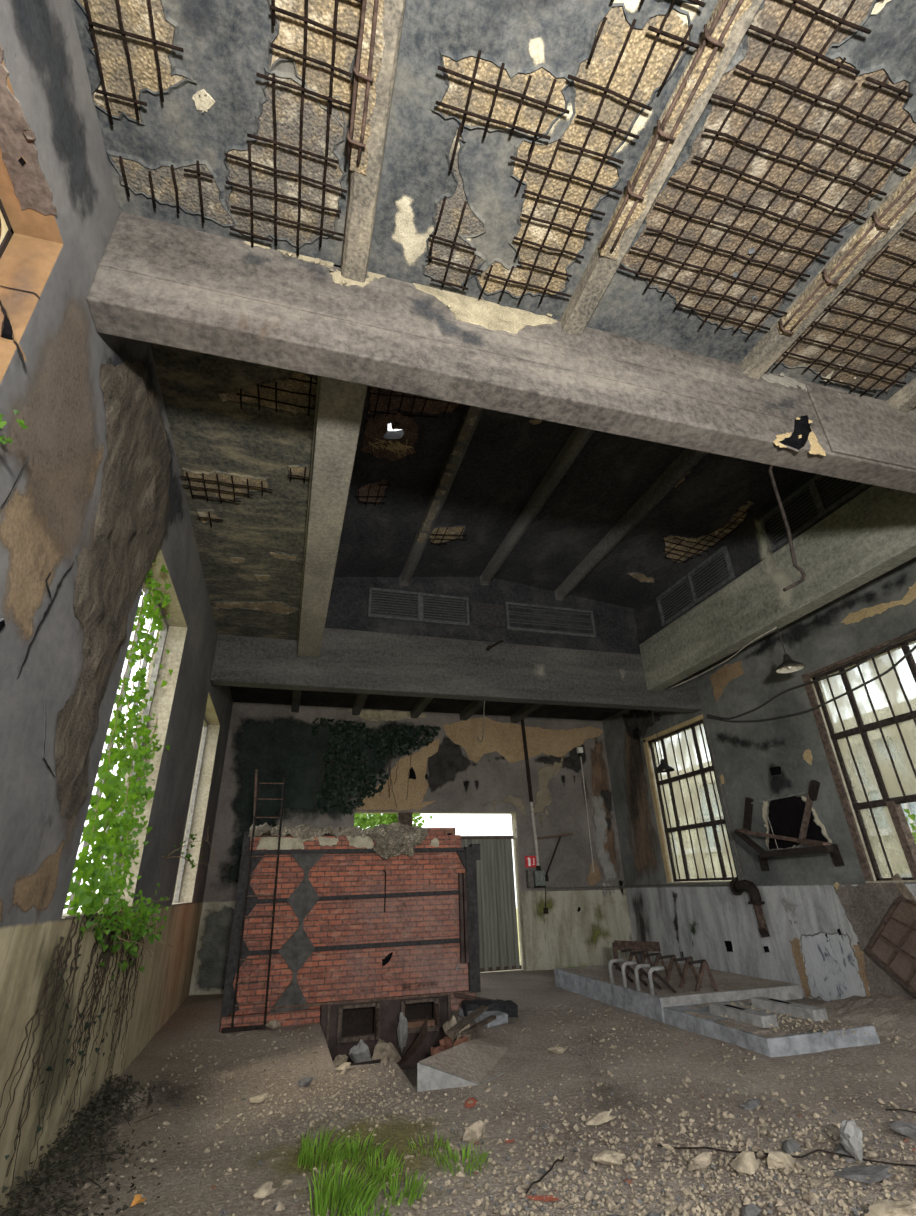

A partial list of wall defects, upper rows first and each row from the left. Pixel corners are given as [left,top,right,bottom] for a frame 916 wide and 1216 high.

spalling [75,0,215,125]
spalling [106,0,386,287]
spalling [413,0,916,397]
crack [0,285,40,362]
spalling [662,500,756,563]
peeling [841,582,916,625]
peeling [348,708,426,721]
peeling [356,716,603,811]
spalling [762,793,832,851]
peeling [789,882,916,1002]